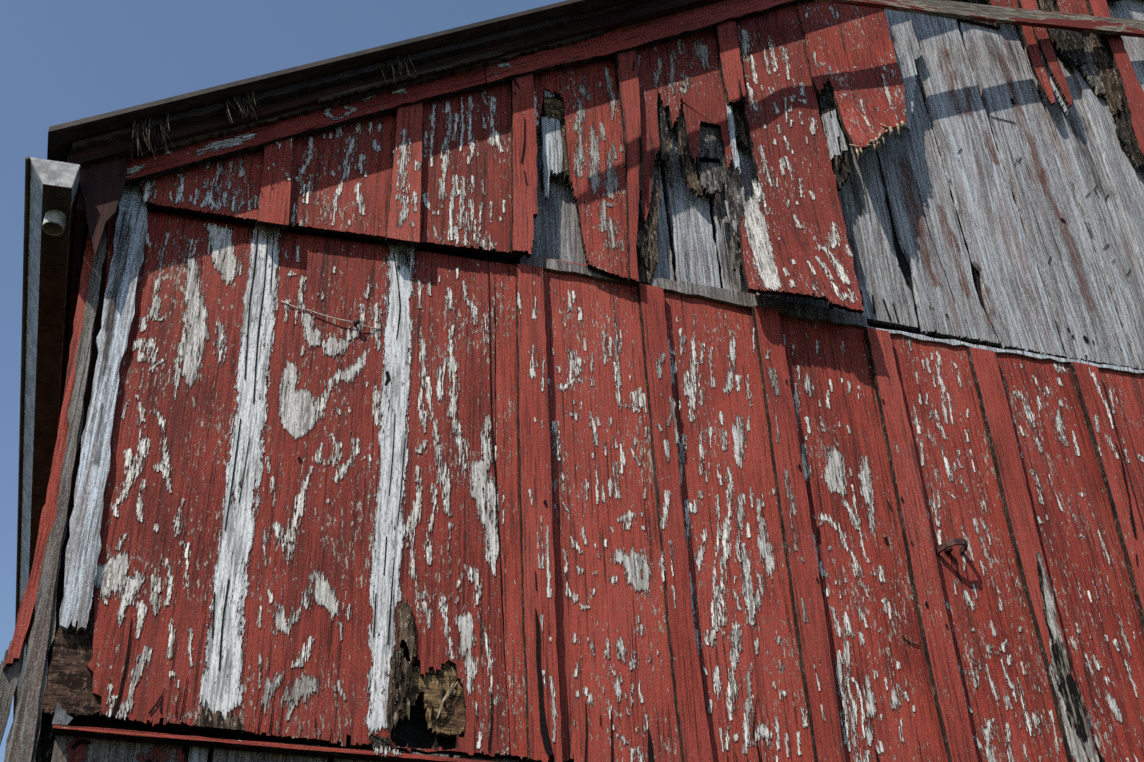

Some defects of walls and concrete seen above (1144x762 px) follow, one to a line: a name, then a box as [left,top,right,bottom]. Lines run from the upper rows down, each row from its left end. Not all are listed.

peeling [572,67,624,252]
peeling [738,29,858,303]
peeling [813,51,899,126]
peeling [517,292,537,319]
peeling [555,290,592,326]
peeling [94,89,506,757]
crack [488,258,503,592]
peeling [528,314,915,762]
crack [535,571,553,757]